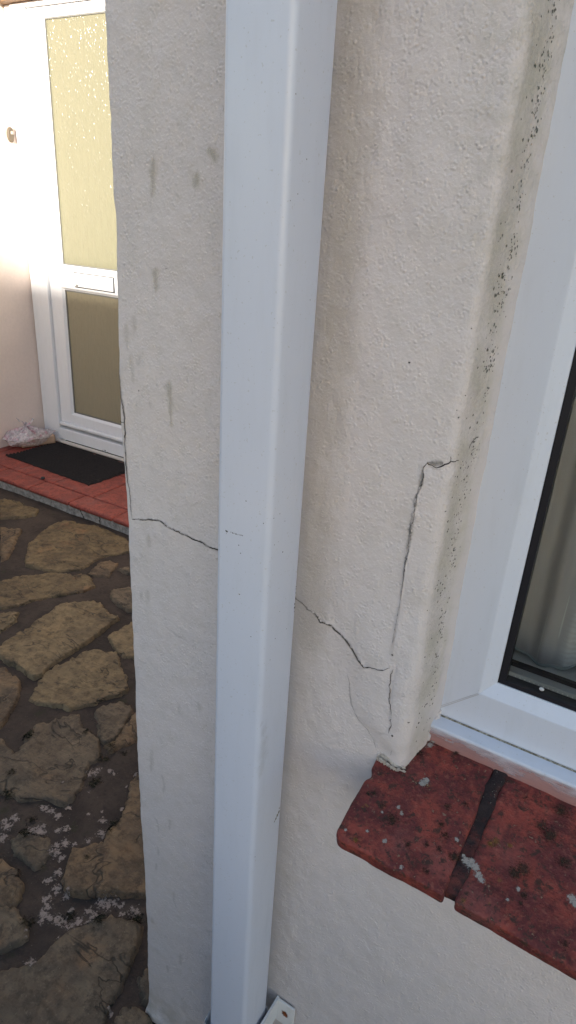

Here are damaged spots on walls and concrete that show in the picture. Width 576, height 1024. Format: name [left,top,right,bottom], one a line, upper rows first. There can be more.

water stain [477,2,557,373]
crack [119,375,218,550]
crack [392,437,478,643]
crack [299,601,393,733]